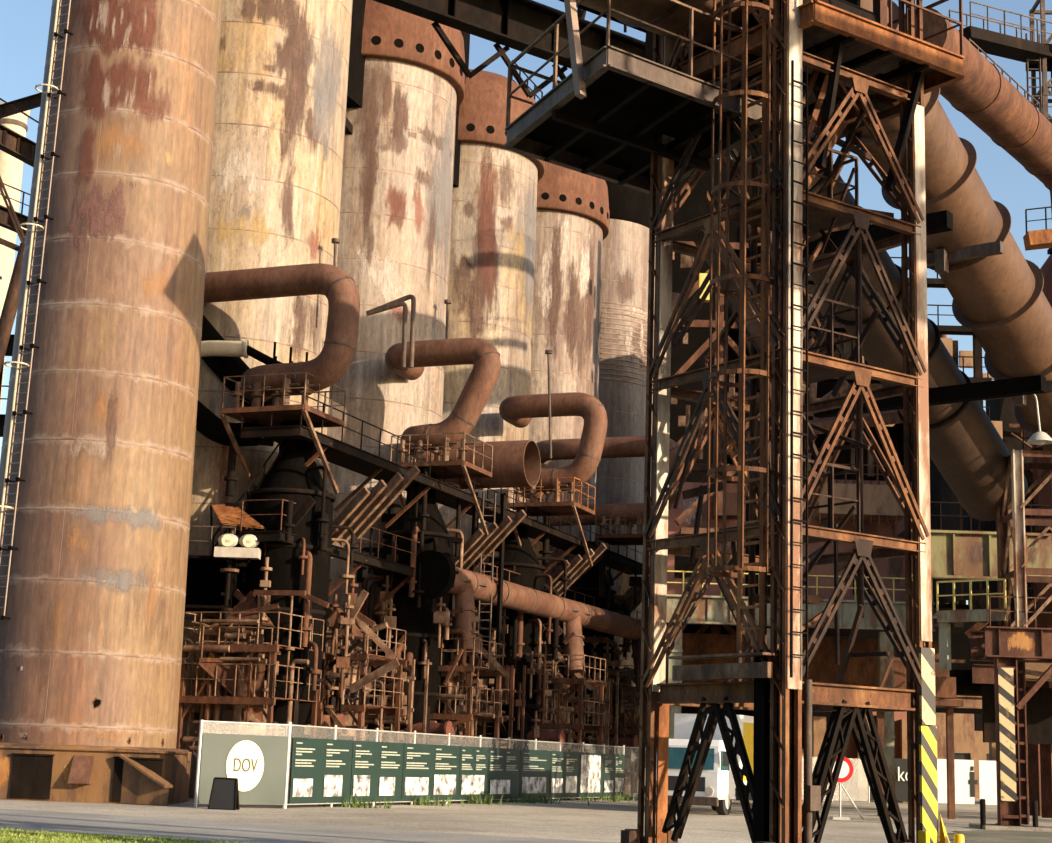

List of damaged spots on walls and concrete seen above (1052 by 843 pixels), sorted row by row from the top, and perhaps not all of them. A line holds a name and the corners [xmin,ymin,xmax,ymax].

rust [78,127,139,181]
rust [102,395,118,462]
rust [1008,632,1032,651]
rust [0,758,11,786]
rust [63,760,79,786]